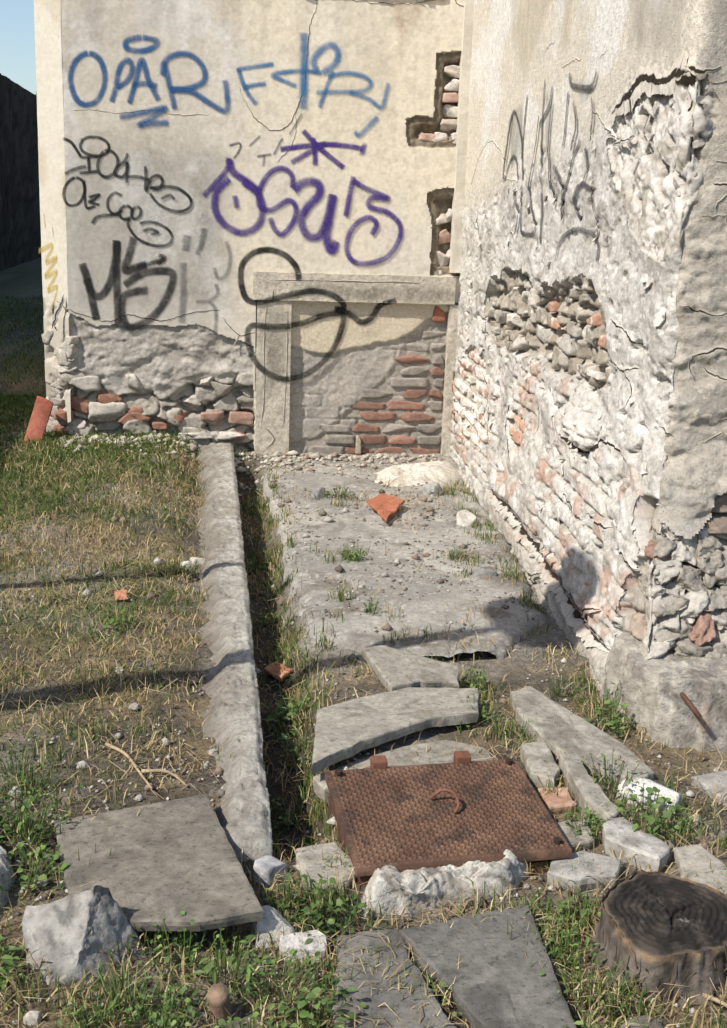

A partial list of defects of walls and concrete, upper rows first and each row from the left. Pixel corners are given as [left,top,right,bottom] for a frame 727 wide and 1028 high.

crack [240,0,464,161]
flaking render [405,50,461,149]
crack [590,50,727,147]
flaking render [426,186,472,312]
spalling [592,74,720,264]
crack [702,161,727,230]
flaking render [41,310,256,453]
flaking render [289,266,612,462]
crack [610,319,649,411]
crack [659,425,674,437]
crack [688,345,727,382]
flaking render [615,492,727,660]